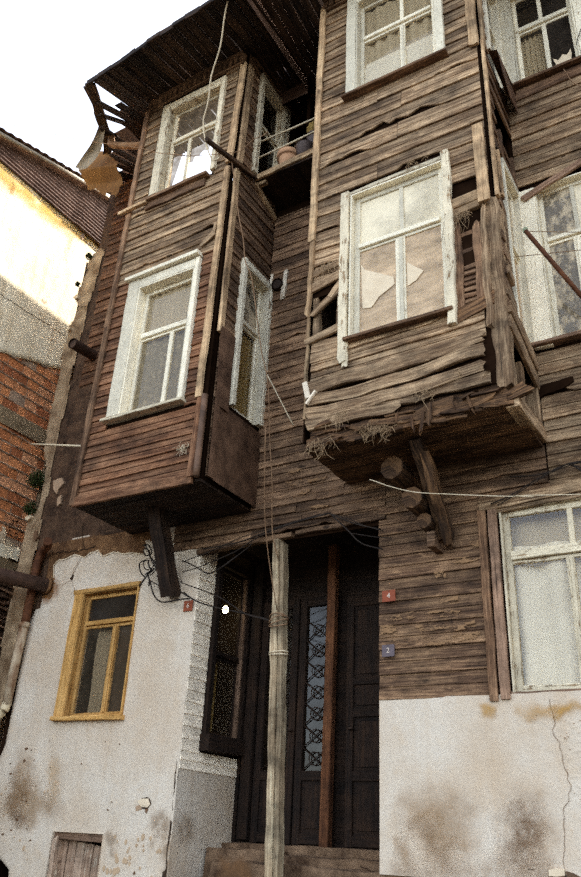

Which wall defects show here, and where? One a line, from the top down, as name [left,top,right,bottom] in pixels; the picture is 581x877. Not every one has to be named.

flaking render [53,478,65,507]
peeling [380,596,481,647]
crack [550,706,571,865]